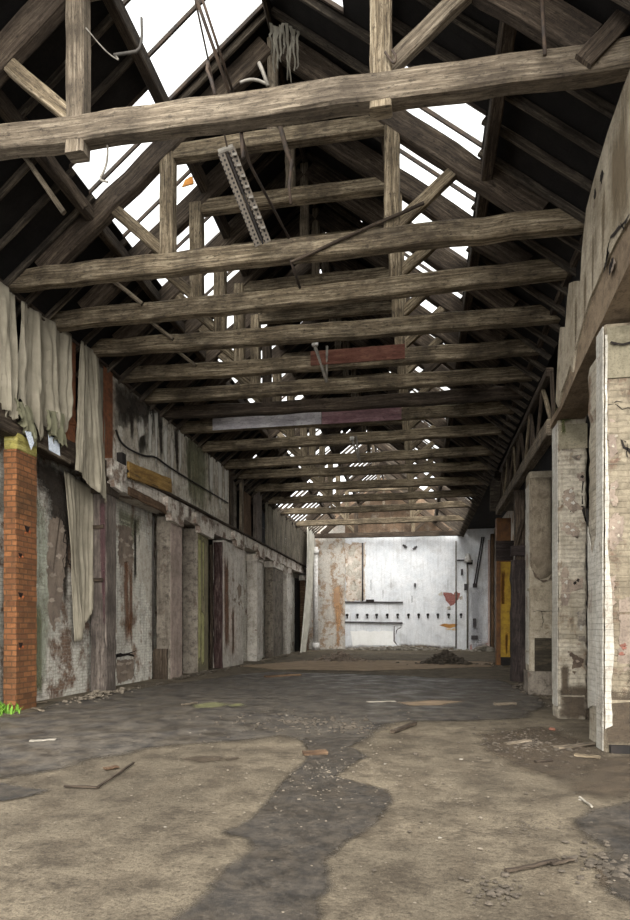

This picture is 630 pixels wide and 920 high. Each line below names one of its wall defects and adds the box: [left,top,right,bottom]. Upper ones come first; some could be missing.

leakage [115,383,191,492]
leakage [209,455,228,509]
peeling [561,488,582,538]
crack [570,481,586,522]
rust [123,521,136,640]
rust [333,586,342,643]
peeling [438,592,463,610]
spalling [560,567,583,606]
peeling [568,609,586,674]